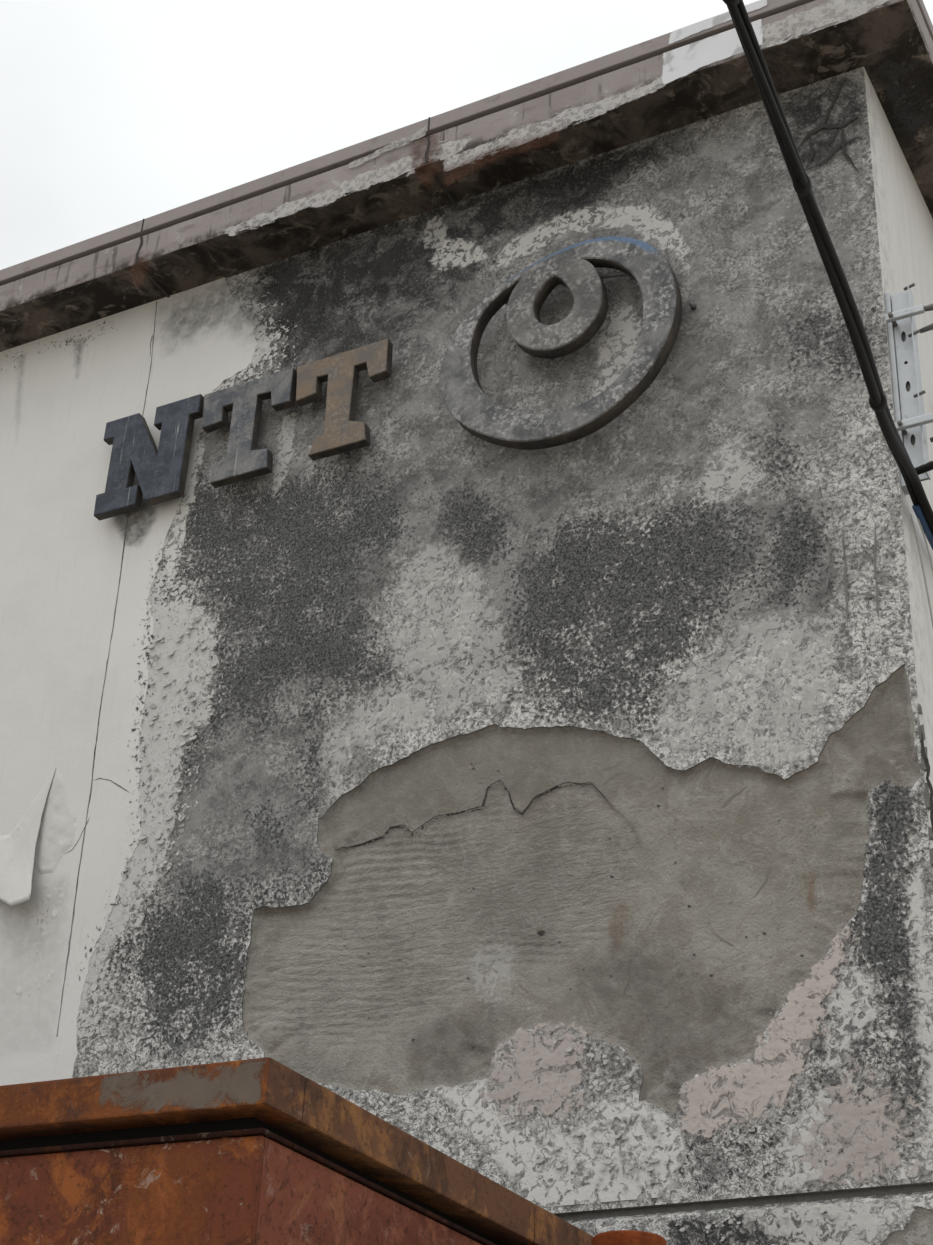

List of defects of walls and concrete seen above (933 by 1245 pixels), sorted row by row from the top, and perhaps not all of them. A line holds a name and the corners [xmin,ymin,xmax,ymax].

peeling [223,76,665,236]
leakage [181,131,690,371]
leakage [593,305,642,397]
mould [773,299,864,395]
peeling [0,768,76,906]
crack [56,513,130,1037]
leakage [78,408,853,1071]
flaking render [242,664,933,1190]
flaking render [880,1207,933,1245]